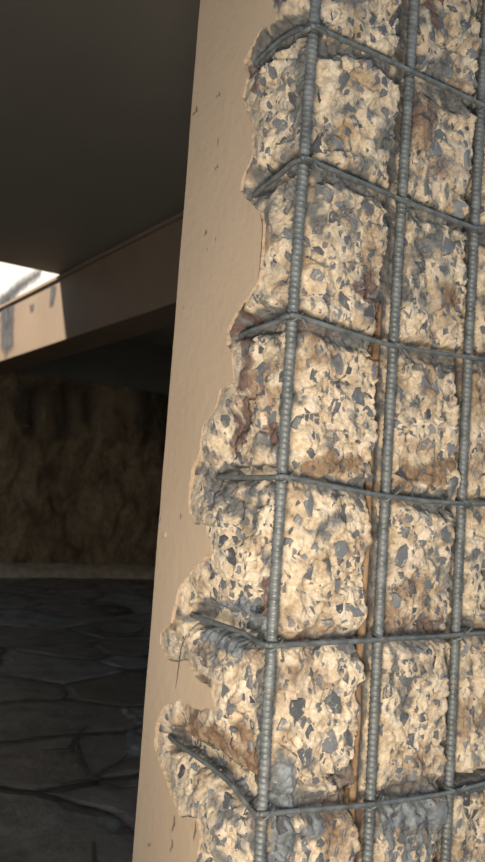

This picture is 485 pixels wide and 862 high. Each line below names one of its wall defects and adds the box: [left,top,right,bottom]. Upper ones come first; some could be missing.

corrosion [229,304,264,458]
corrosion [264,422,278,445]
spalling [157,0,485,862]